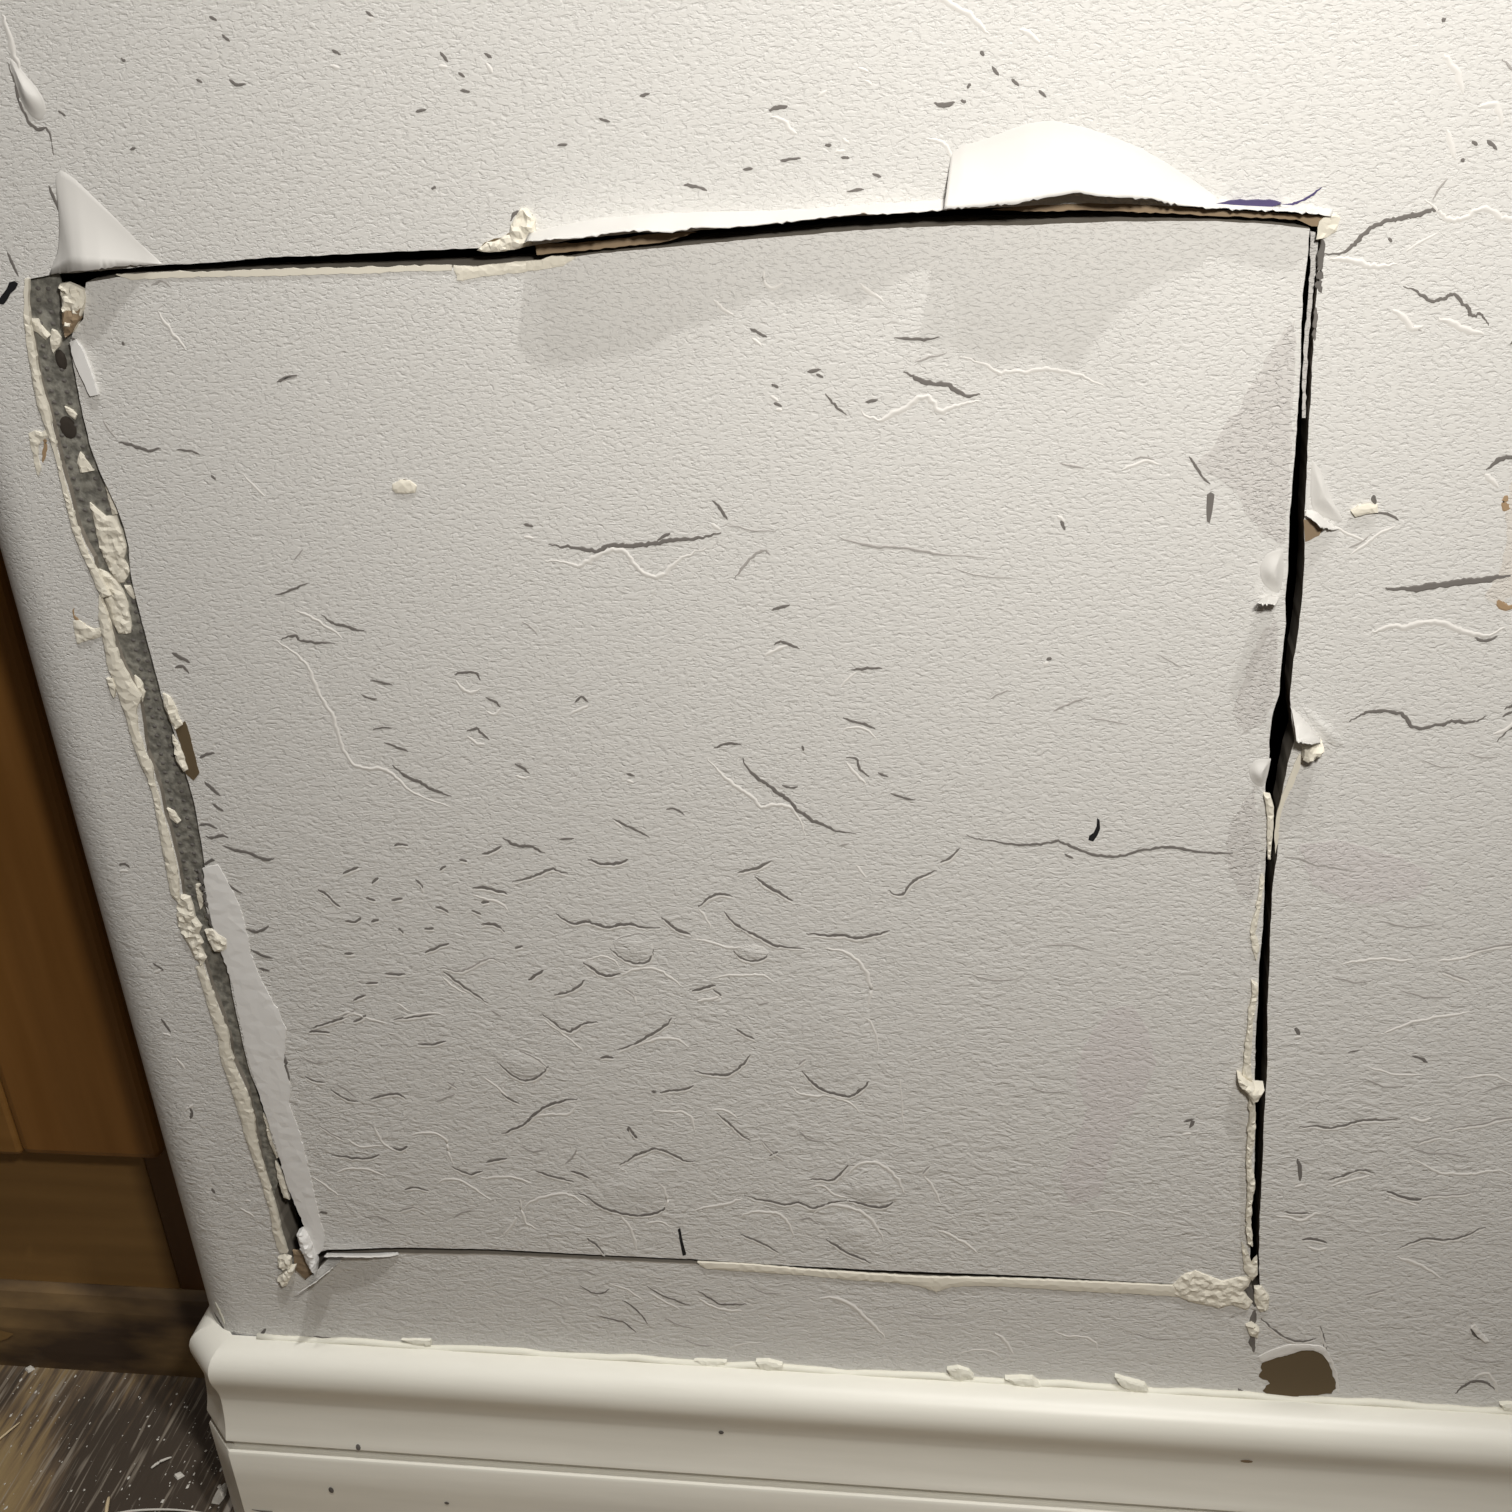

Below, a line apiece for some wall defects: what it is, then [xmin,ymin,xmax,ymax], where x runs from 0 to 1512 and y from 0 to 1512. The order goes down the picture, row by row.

peeling [525,121,1334,242]
peeling [49,170,161,275]
crack [1312,179,1447,341]
crack [1403,286,1512,345]
crack [548,500,775,579]
peeling [1305,510,1338,531]
peeling [1351,504,1378,517]
peeling [73,620,102,644]
peeling [1257,596,1279,605]
crack [1385,574,1511,593]
crack [1349,704,1512,768]
crack [284,807,1356,1352]